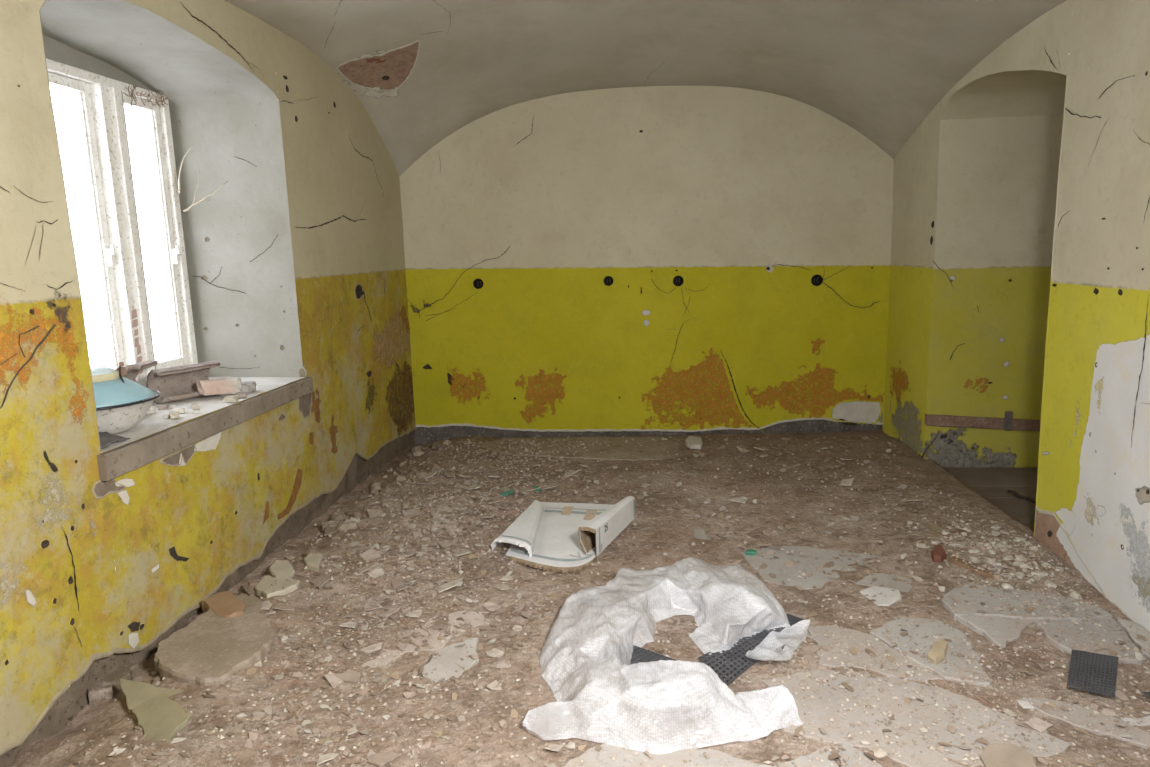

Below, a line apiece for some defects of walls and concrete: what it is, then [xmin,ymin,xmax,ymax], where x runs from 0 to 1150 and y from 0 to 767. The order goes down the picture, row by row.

crack [182,4,262,73]
flaking render [336,40,420,99]
crack [296,129,384,233]
crack [0,186,72,291]
peeling [0,303,88,425]
crack [720,350,764,431]
flaking render [922,427,1017,467]
flaking render [1034,335,1150,631]
flaking render [0,338,910,767]